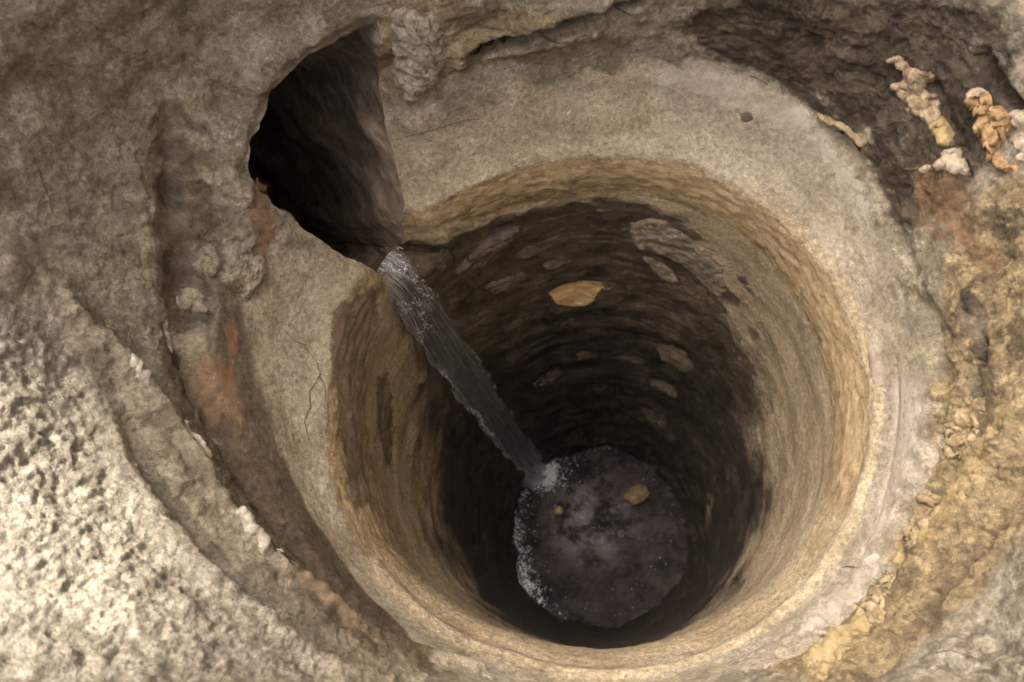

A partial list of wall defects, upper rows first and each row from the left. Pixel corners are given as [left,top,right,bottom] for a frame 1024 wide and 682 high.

crack [285,331,326,440]